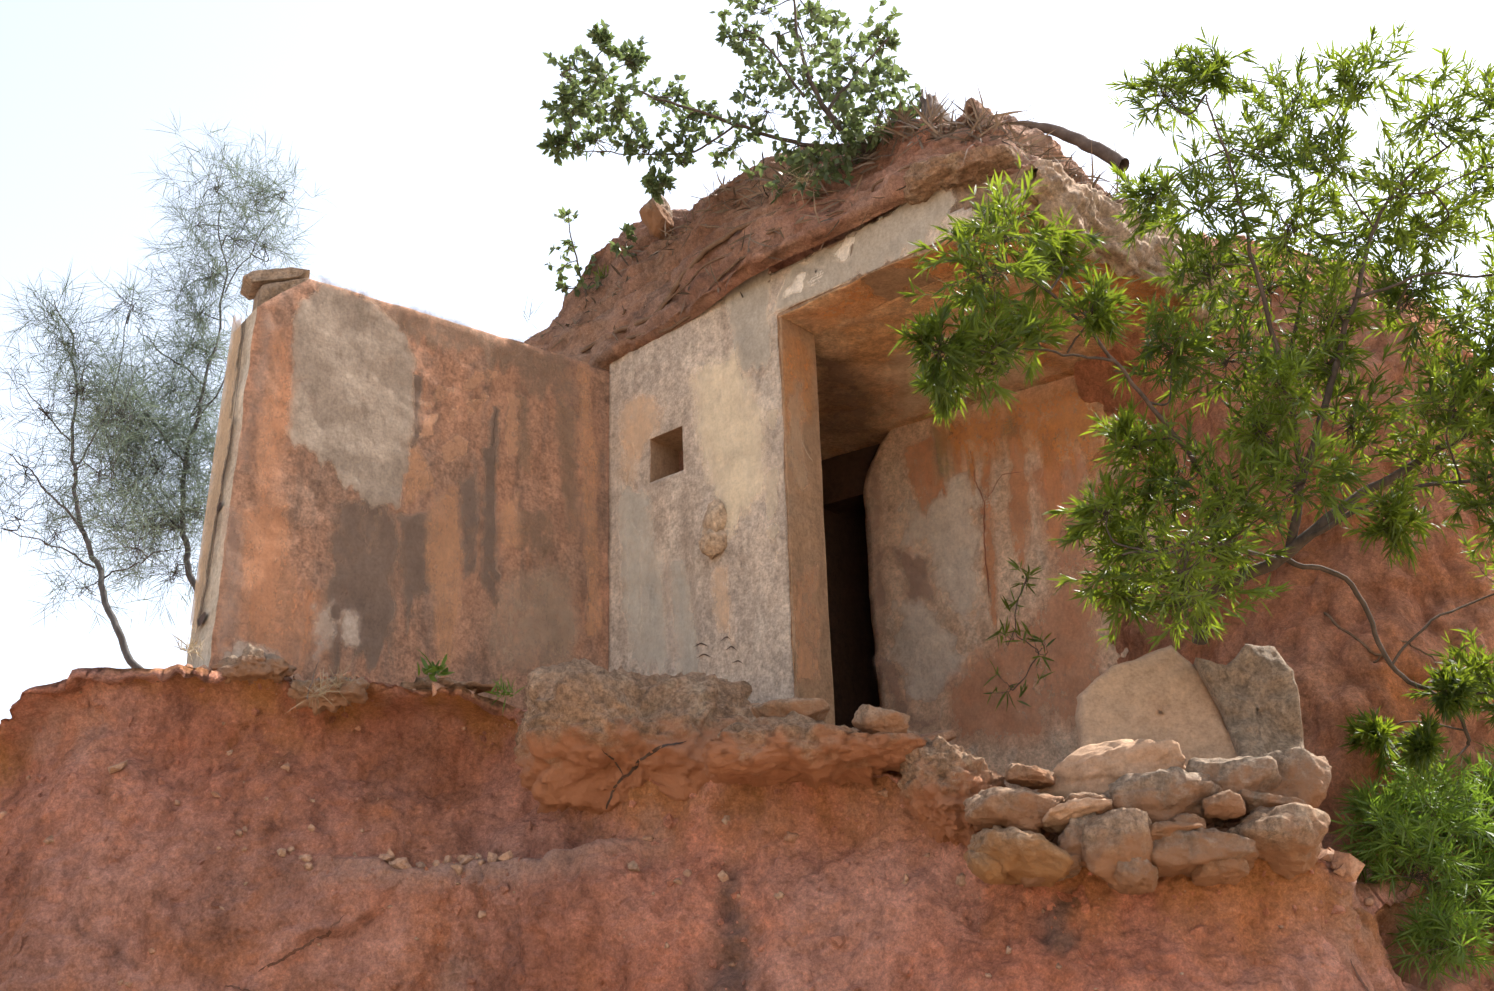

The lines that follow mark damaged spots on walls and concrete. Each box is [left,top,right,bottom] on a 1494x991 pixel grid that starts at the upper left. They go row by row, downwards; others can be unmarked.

peeling [252,278,498,509]
leakage [323,499,432,677]
leakage [351,292,578,607]
peeling [887,456,1099,741]